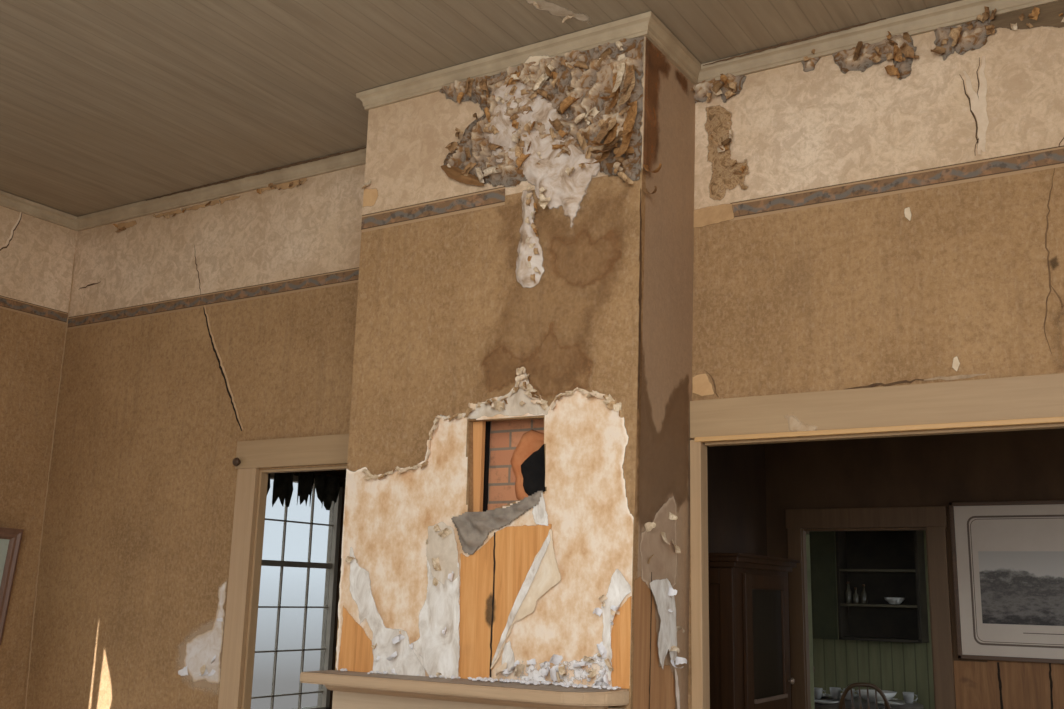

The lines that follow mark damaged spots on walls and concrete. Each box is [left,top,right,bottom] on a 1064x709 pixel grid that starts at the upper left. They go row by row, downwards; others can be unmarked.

peeling [439,36,644,283]
crack [0,212,22,251]
crack [1044,137,1064,354]
crack [194,246,243,431]
peeling [495,367,624,418]
spalling [362,407,491,512]
spalling [510,430,546,500]
peeling [640,496,681,597]
flaking render [178,582,227,684]